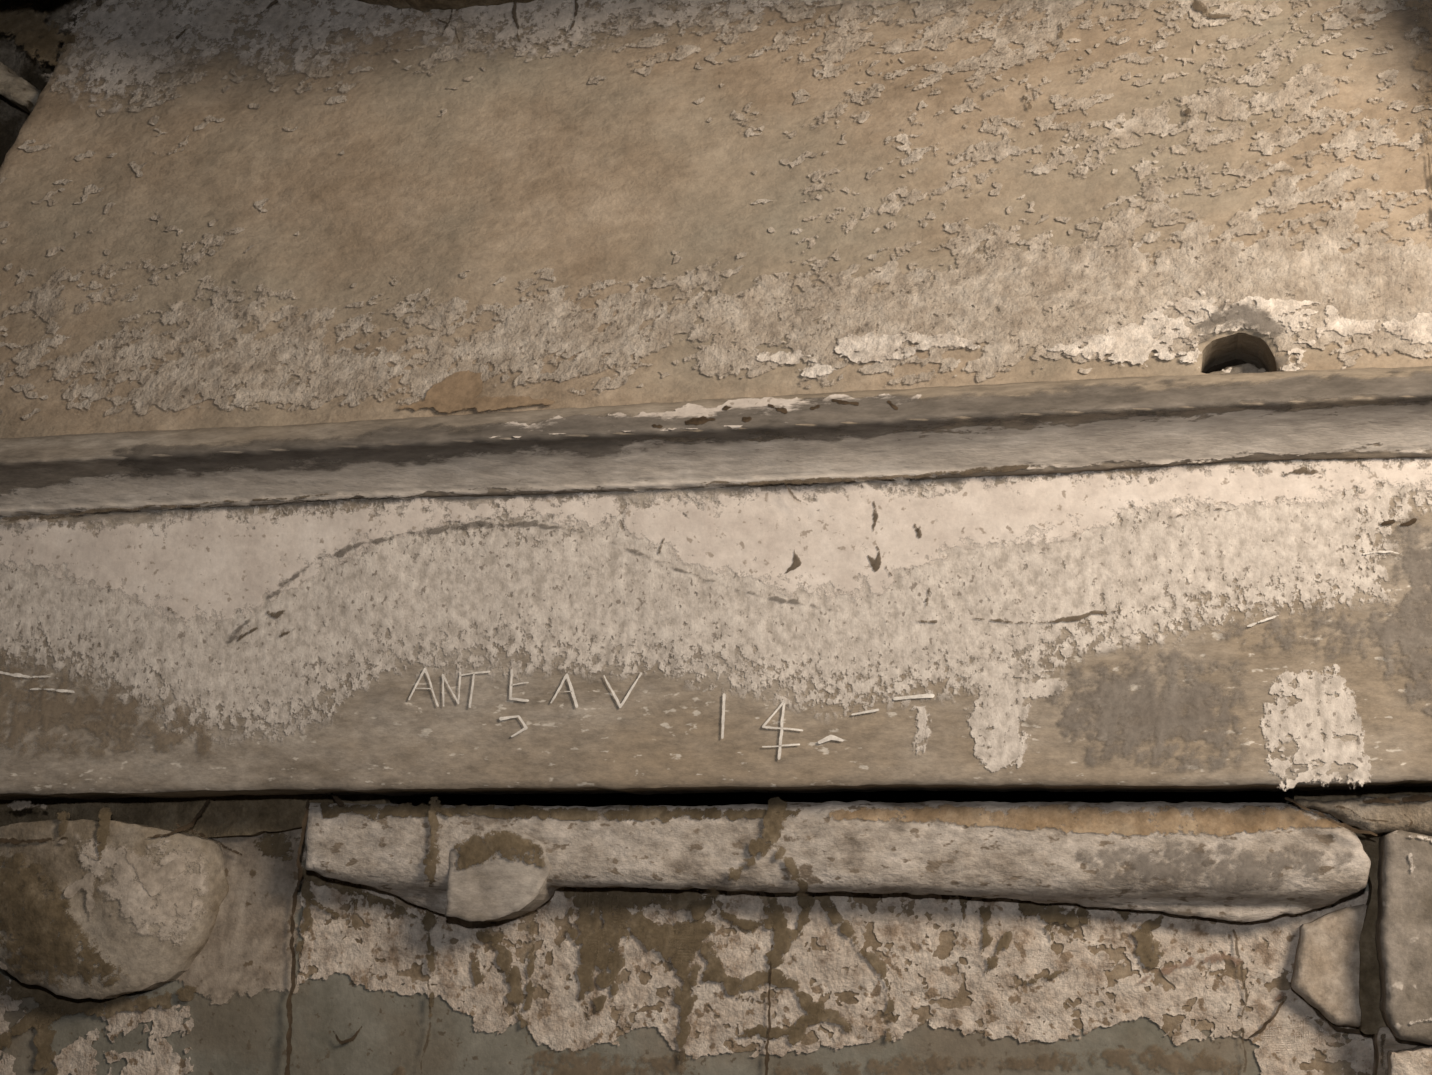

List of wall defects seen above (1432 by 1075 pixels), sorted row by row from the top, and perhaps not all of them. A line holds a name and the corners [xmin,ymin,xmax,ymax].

crack [437,9,460,42]
crack [512,1,520,41]
crack [569,0,579,33]
peeling [7,801,47,810]
crack [0,836,68,844]
crack [147,799,242,856]
crack [284,793,344,1075]
peeling [53,828,1374,1075]
crack [764,945,773,1075]
crack [1233,929,1386,1072]
crack [333,1026,362,1044]